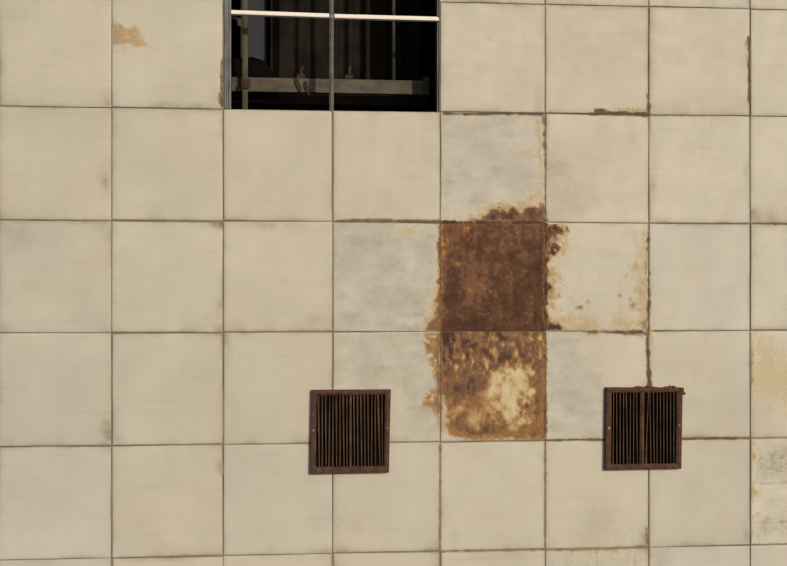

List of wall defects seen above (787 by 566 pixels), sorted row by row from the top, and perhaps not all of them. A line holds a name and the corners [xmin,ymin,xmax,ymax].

corrosion [585,94,651,118]
corrosion [443,112,547,149]
corrosion [337,186,684,553]